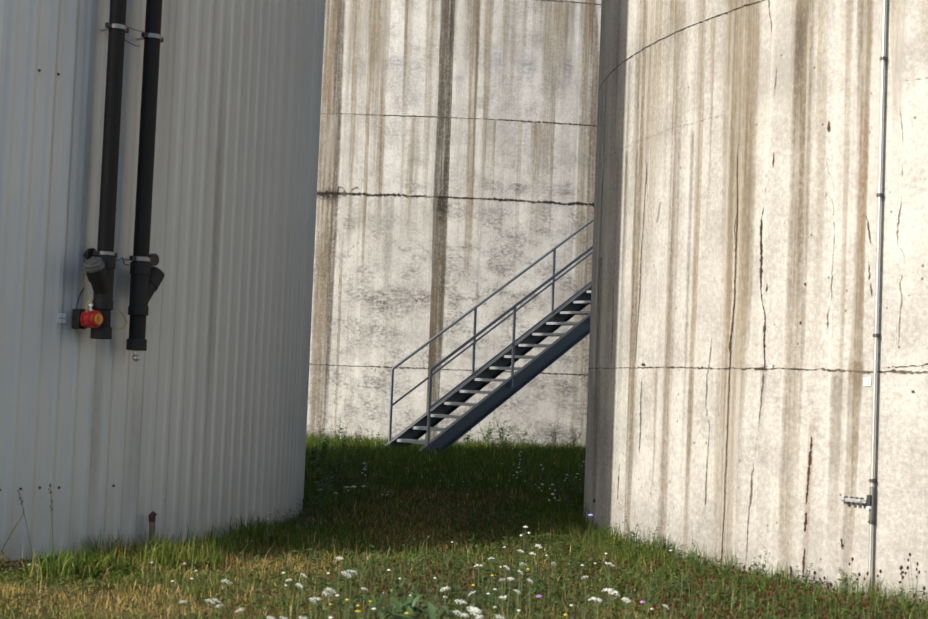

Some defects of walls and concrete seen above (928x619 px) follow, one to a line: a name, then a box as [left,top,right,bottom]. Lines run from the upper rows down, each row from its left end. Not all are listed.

leakage [312,0,387,433]
leakage [421,0,491,412]
leakage [544,0,602,286]
leakage [628,84,643,451]
leakage [655,151,675,453]
leakage [689,124,700,393]
crack [705,164,767,558]
leakage [724,32,753,374]
leakage [793,0,813,297]
leakage [853,0,871,394]